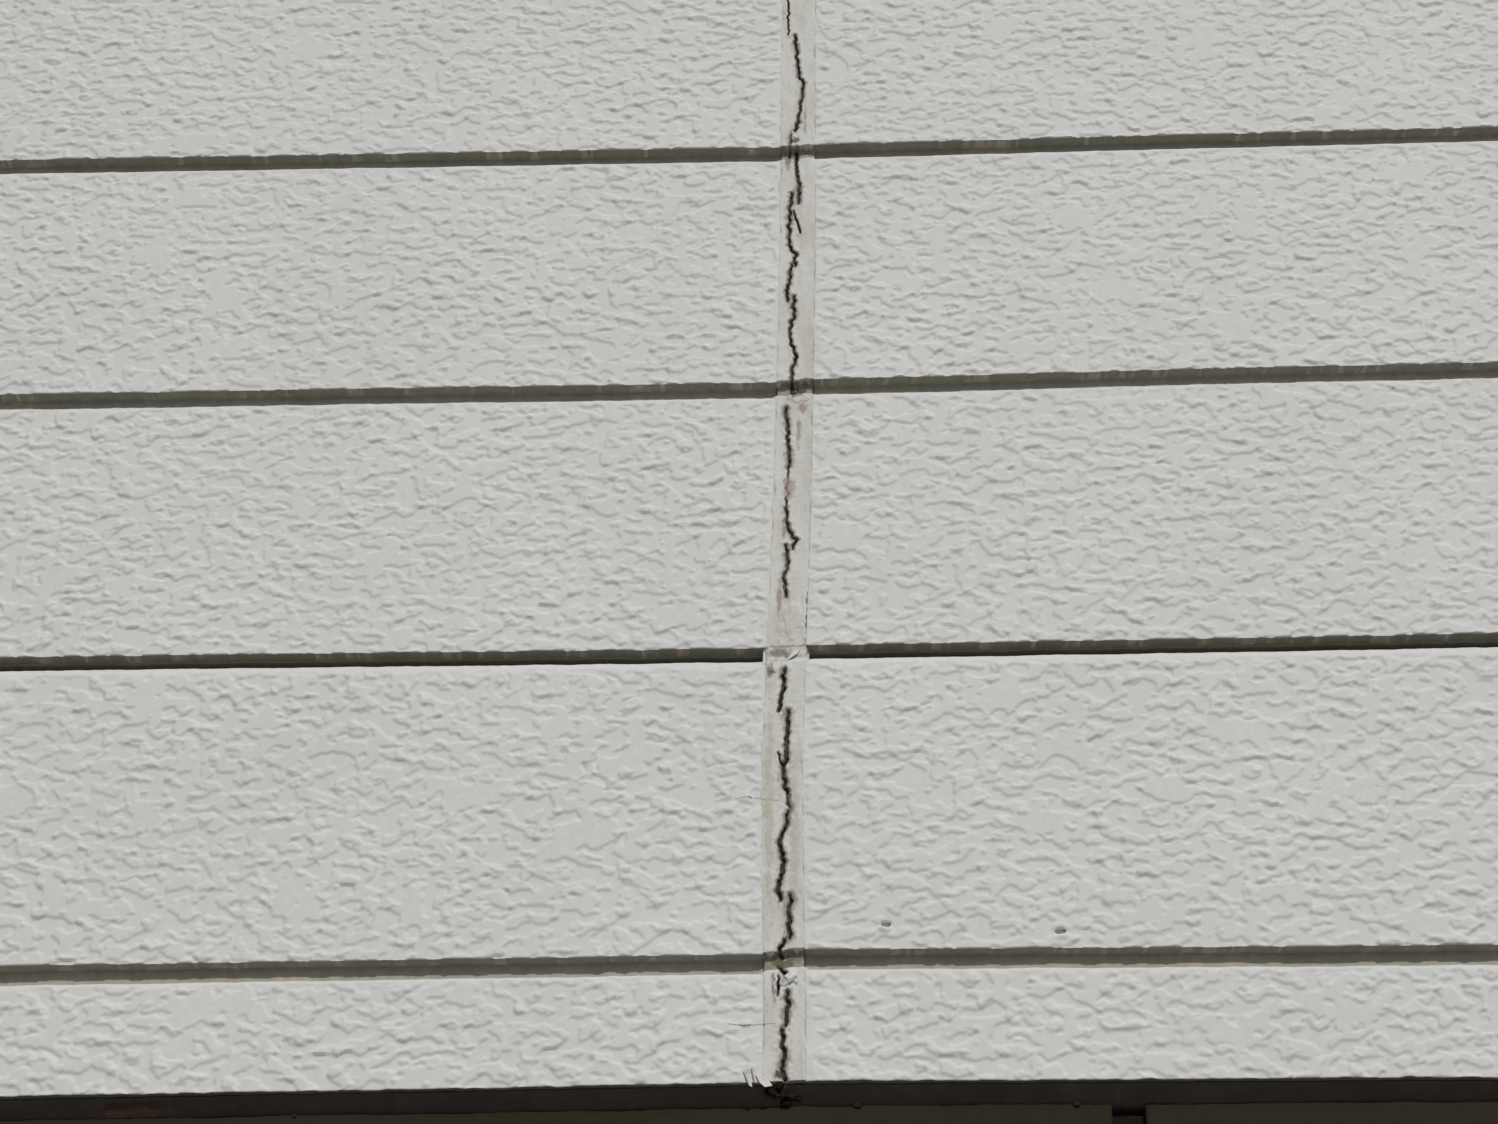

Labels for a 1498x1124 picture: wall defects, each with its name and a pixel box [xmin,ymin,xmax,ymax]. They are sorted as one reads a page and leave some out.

crack [734,0,809,1082]